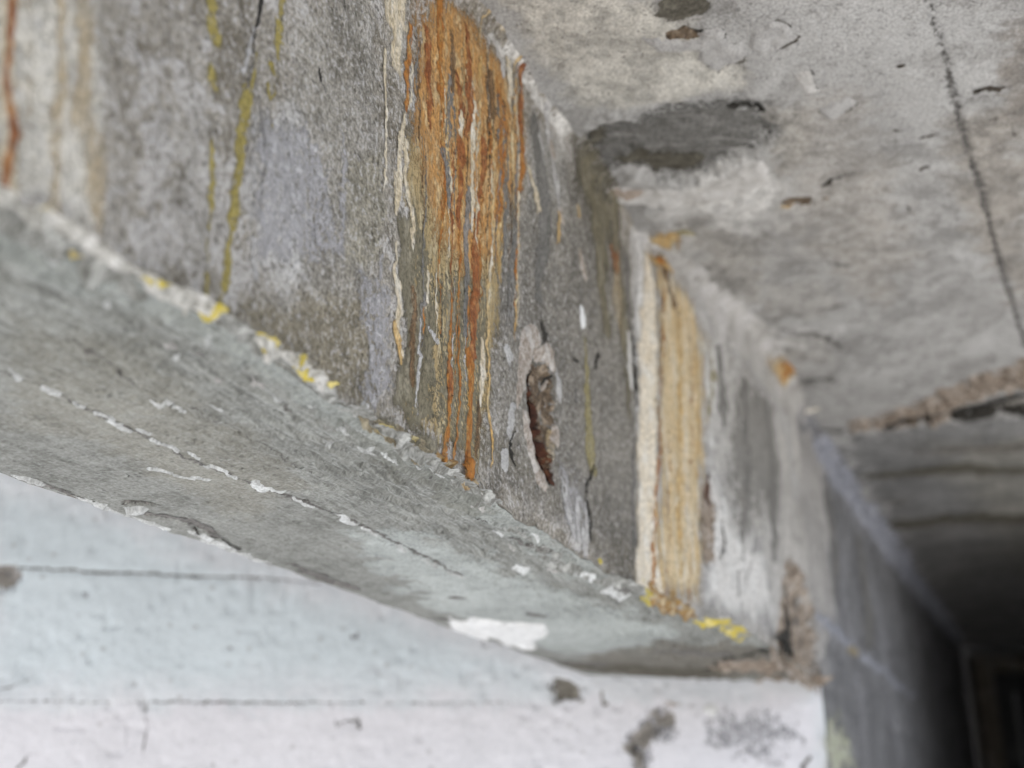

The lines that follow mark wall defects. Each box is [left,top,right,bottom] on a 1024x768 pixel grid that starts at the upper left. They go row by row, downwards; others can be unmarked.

rust [0,0,25,201]
rust [392,0,542,507]
spalling [504,321,577,492]
leakage [529,100,565,306]
rust [640,253,709,622]
leakage [575,98,780,596]
spalling [847,358,1024,434]